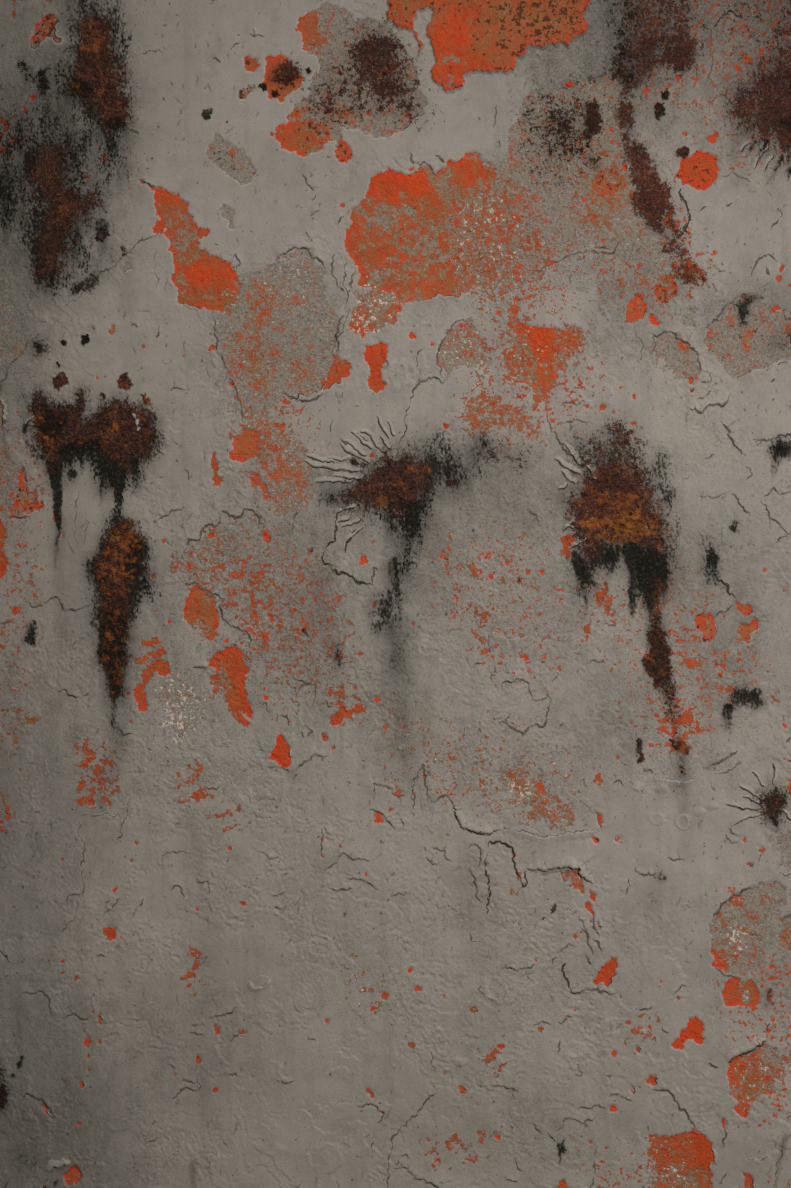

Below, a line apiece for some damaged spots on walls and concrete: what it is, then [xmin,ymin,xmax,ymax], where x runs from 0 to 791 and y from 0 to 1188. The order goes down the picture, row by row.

corrosion [0,0,137,296]
corrosion [508,0,791,287]
corrosion [23,361,164,729]
peeling [126,71,791,843]
corrosion [555,418,690,775]
crack [369,744,741,942]
peeling [709,828,791,1007]
crack [713,828,791,919]
crack [533,1089,695,1187]
peeling [646,1128,718,1188]
crack [720,1127,791,1188]
peeling [721,1018,791,1128]